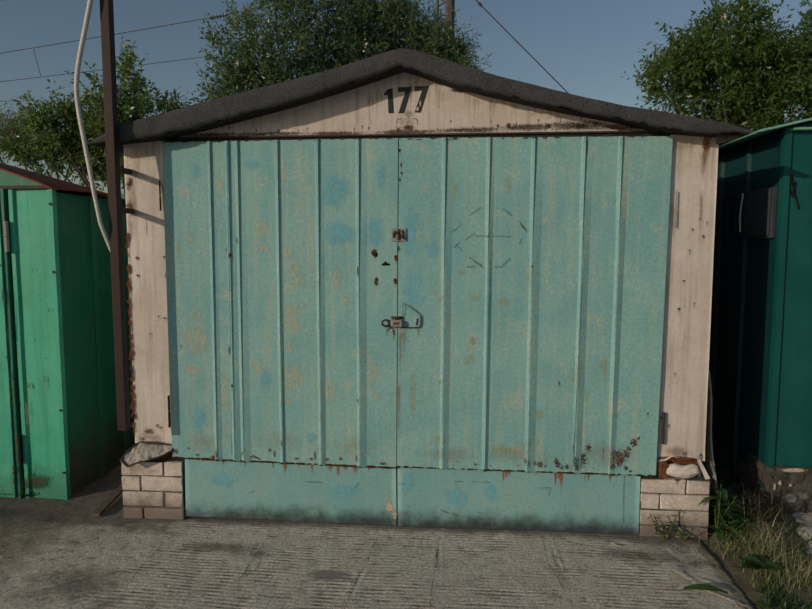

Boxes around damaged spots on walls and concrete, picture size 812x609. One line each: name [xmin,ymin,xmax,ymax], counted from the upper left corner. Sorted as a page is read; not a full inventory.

rust [172,444,439,473]
rust [452,464,656,484]